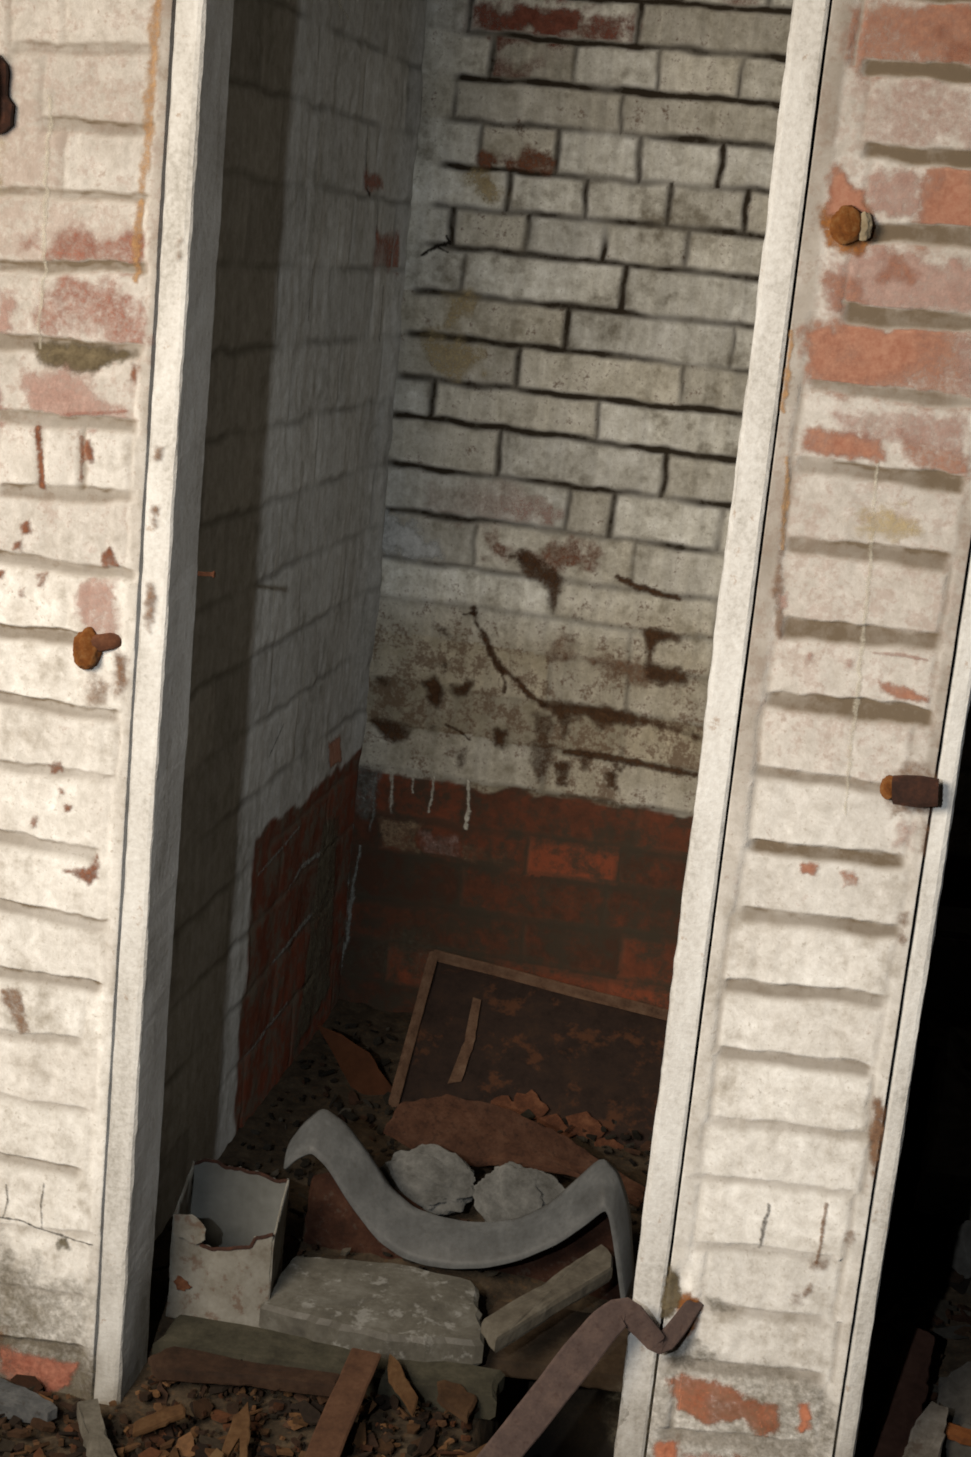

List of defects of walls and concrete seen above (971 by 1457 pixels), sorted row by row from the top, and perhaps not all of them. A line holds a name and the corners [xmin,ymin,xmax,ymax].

peeling [847,4,971,65]
peeling [826,167,971,226]
rust [820,207,868,256]
peeling [22,278,141,417]
peeling [803,245,971,390]
peeling [803,414,966,474]
leakage [615,575,681,601]
crack [463,606,546,707]
leakage [532,713,569,778]
flaking render [654,1441,715,1457]
flaking render [670,1374,780,1436]
flaking render [798,1404,812,1433]